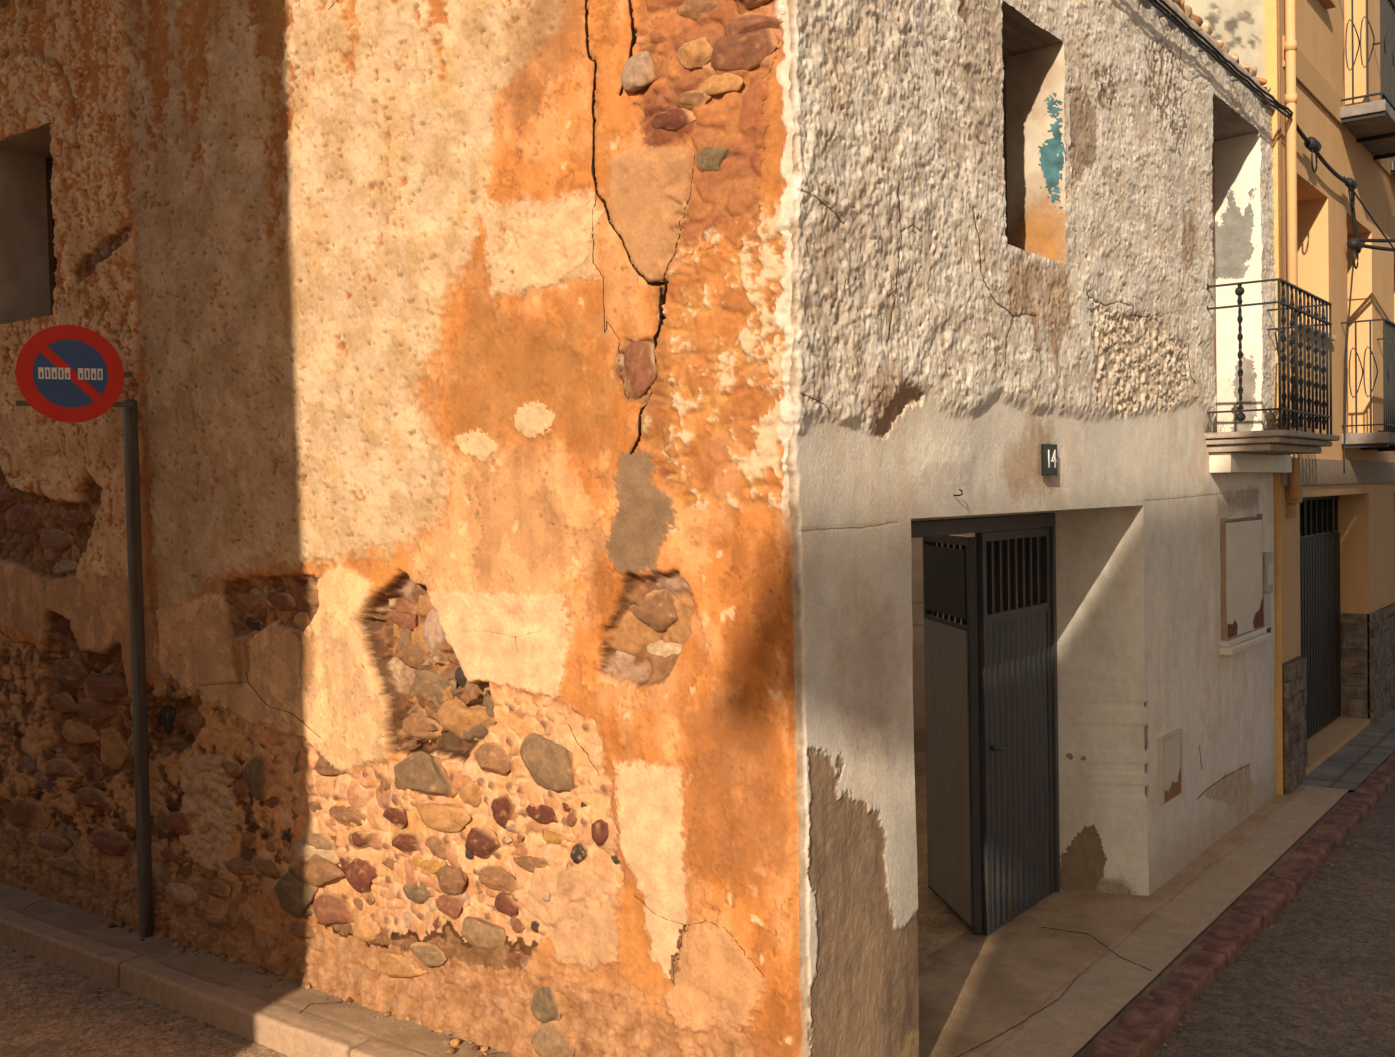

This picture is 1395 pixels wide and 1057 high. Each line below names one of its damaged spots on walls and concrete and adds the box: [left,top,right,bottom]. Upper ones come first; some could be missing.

flaking render [504,0,785,294]
peeling [1038,64,1115,209]
peeling [1142,39,1187,162]
crack [585,0,696,454]
crack [972,205,1036,364]
spalling [874,379,923,438]
spalling [0,466,103,579]
spalling [45,611,134,810]
flaking render [153,573,766,1057]
peeling [807,747,919,1057]
peeling [1060,824,1107,892]